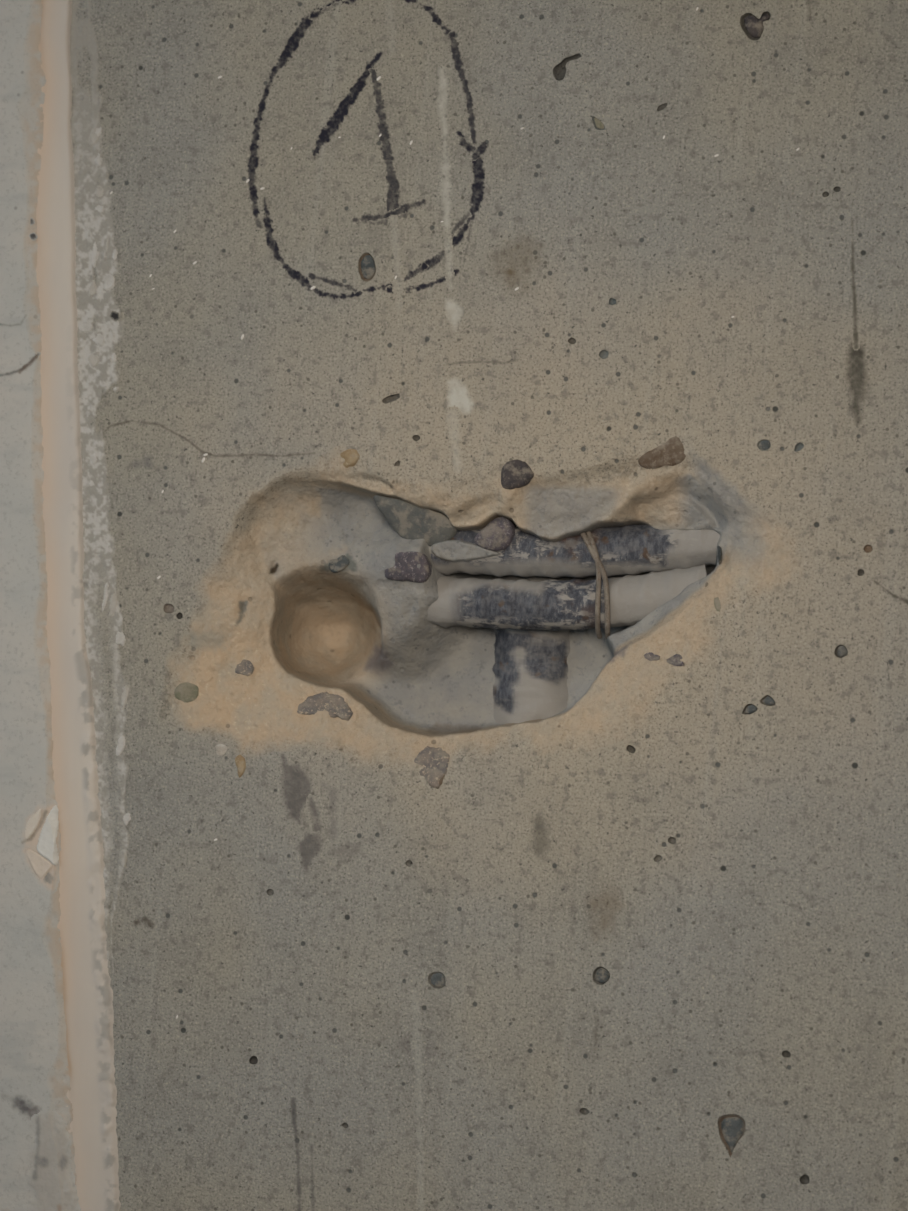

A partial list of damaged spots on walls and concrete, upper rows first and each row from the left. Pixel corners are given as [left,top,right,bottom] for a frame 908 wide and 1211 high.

spalling [153,427,813,789]
crack [872,579,908,606]